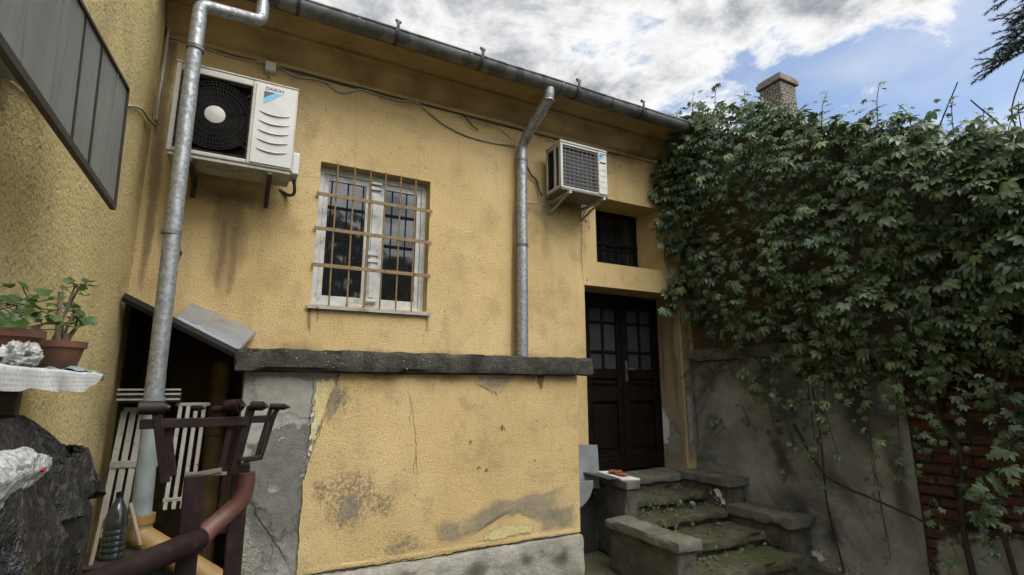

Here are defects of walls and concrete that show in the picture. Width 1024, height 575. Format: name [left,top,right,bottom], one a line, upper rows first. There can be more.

crack [250,502,290,568]
flaking render [241,375,342,575]
crack [408,388,418,492]
damp [437,491,573,539]